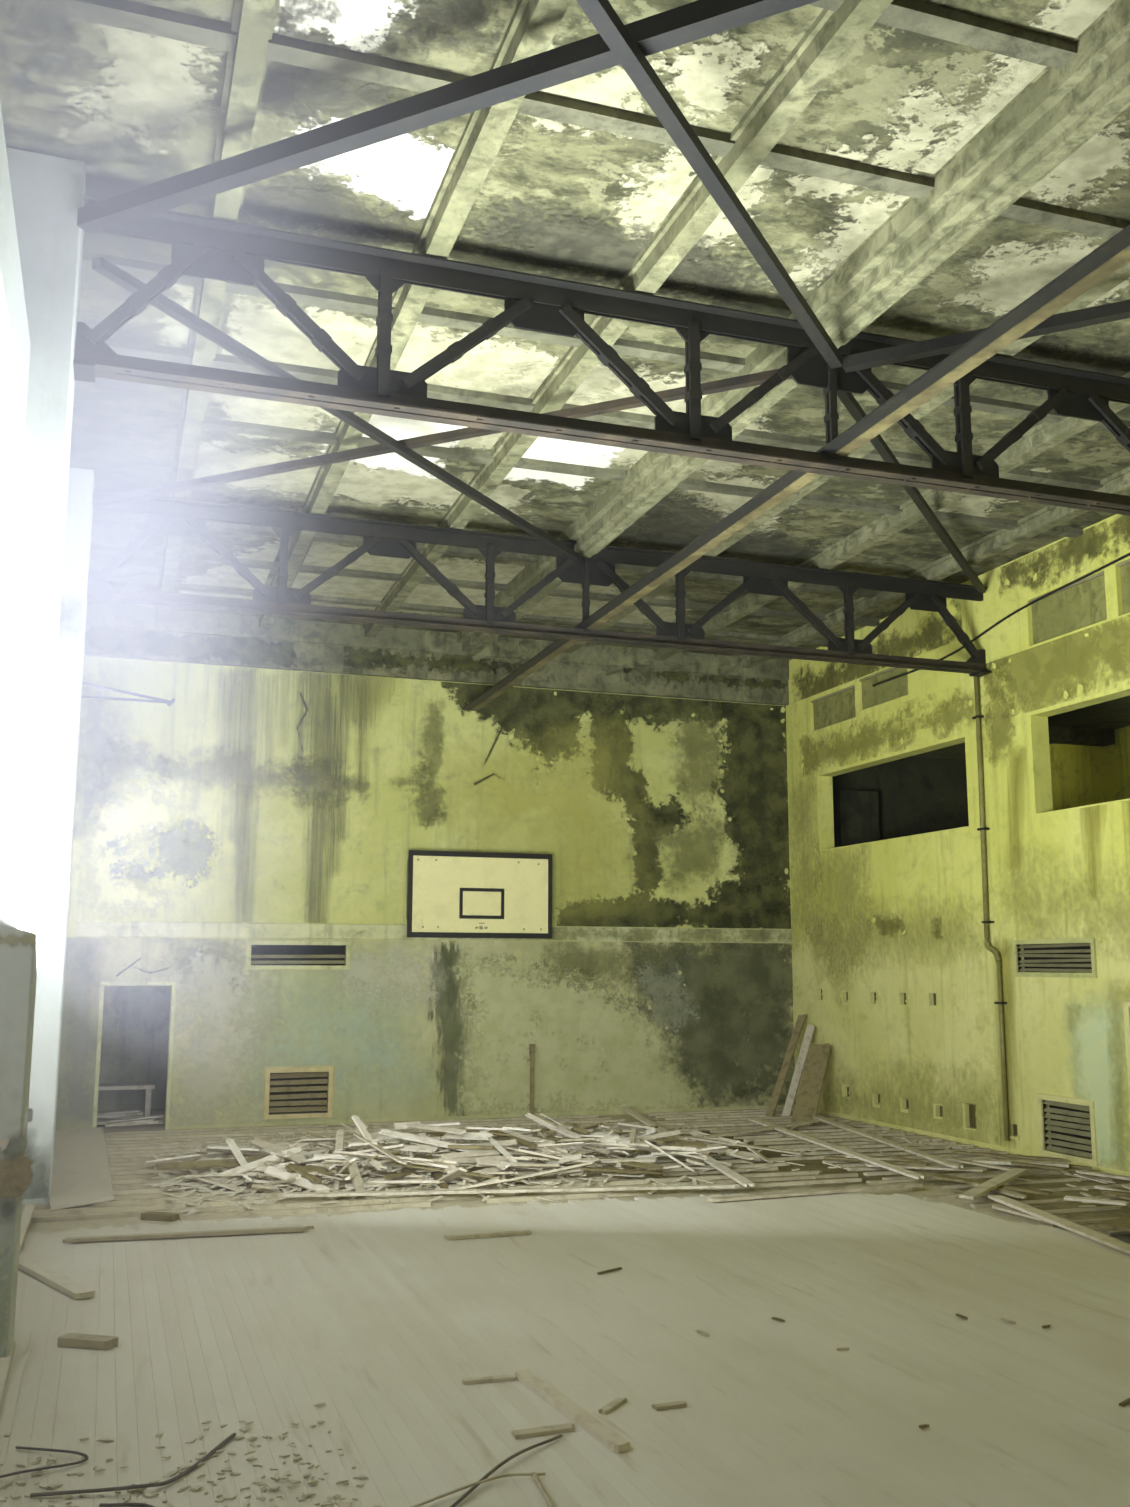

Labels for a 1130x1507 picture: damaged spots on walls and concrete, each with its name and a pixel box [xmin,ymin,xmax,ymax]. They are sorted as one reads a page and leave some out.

peeling [274,0,418,53]
peeling [284,110,345,138]
peeling [518,114,632,147]
peeling [540,65,650,114]
peeling [646,30,775,127]
peeling [300,133,454,221]
leakage [472,196,653,287]
leakage [657,236,766,310]
leakage [1012,336,1130,376]
leakage [59,600,523,923]
leakage [548,601,962,1107]
leakage [428,942,468,1116]